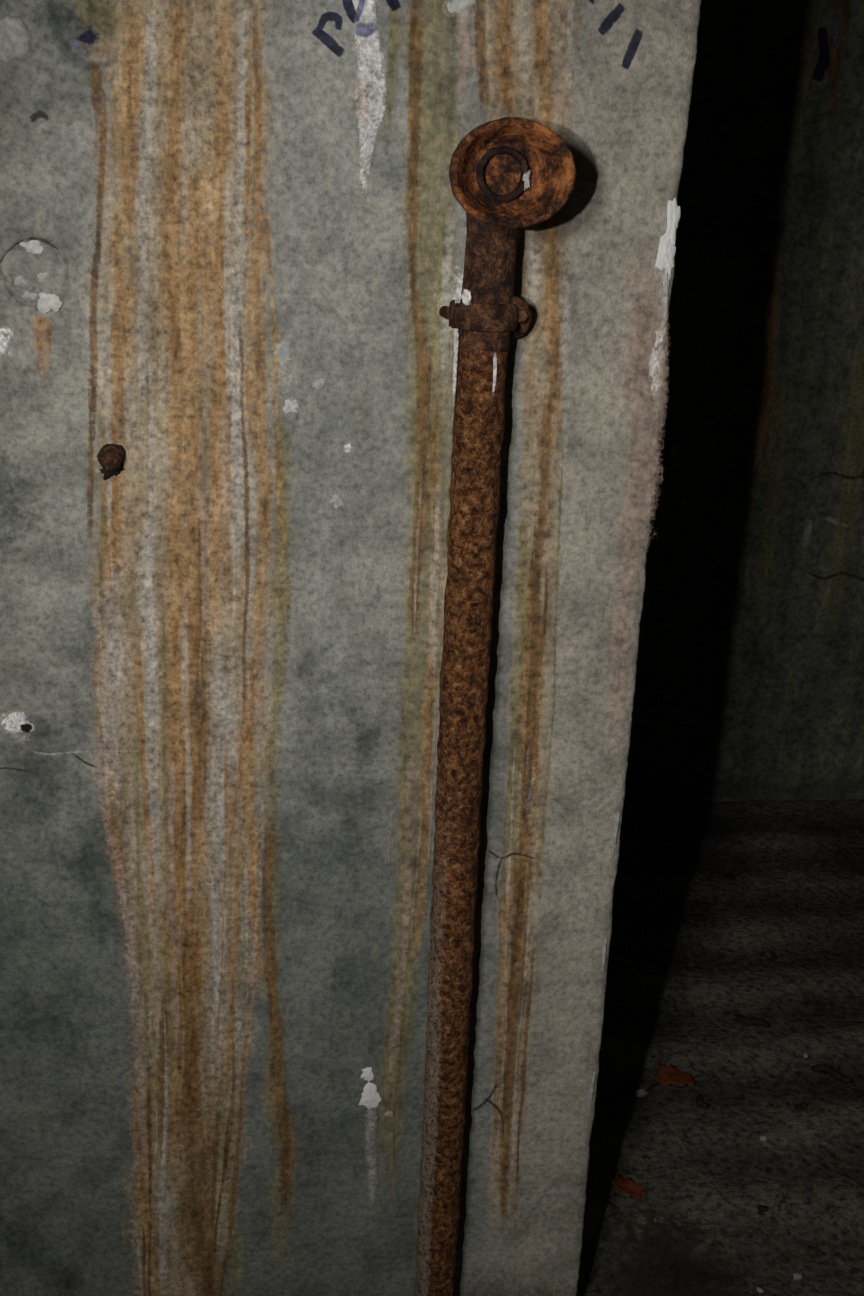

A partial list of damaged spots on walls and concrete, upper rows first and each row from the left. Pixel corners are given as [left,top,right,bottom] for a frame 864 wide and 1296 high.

corrosion [474,0,579,140]
corrosion [87,0,294,1296]
corrosion [490,203,570,1233]